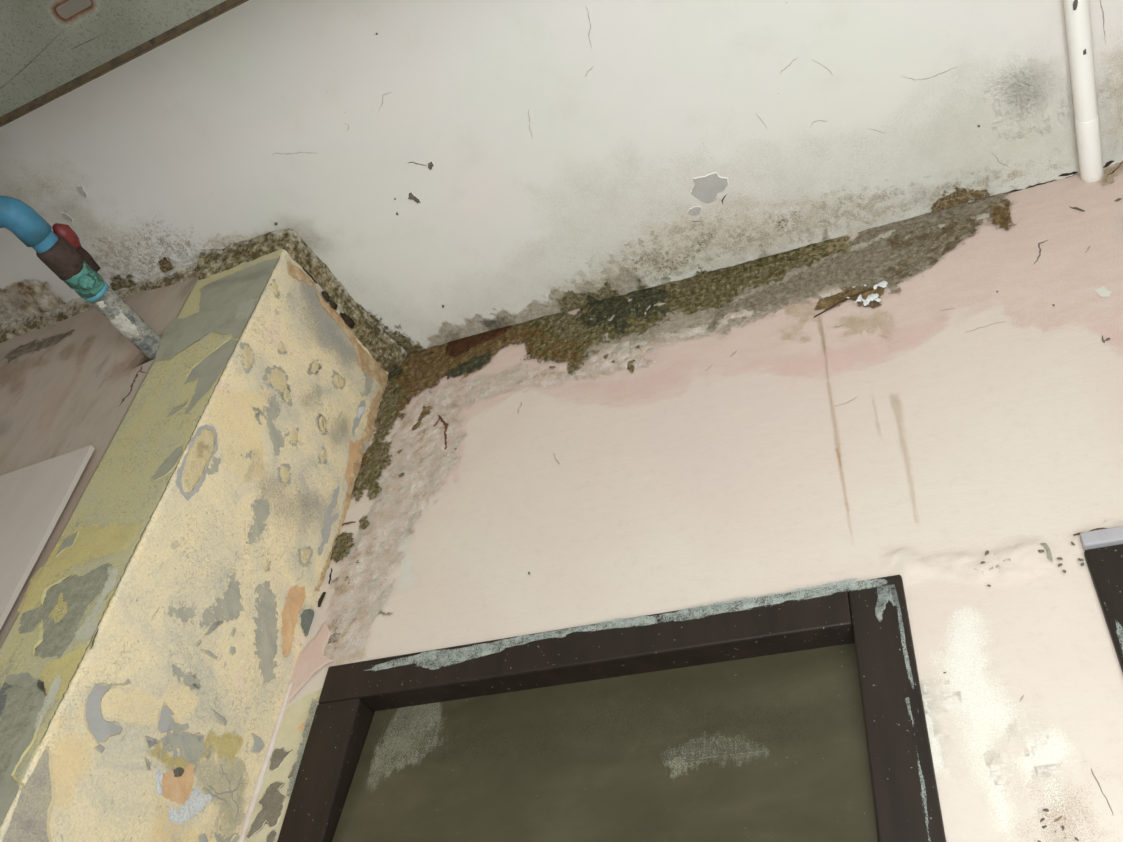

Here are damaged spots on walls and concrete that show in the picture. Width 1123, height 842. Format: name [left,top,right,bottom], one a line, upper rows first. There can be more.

flaking render [0,279,66,323]
damp [0,20,1123,504]
peeling [687,172,729,222]
flaking render [776,262,920,348]
rust [817,316,854,542]
peeling [18,563,119,659]
damp [249,465,370,607]
peeling [144,258,756,842]
peeling [0,672,62,842]
peeling [84,678,131,754]